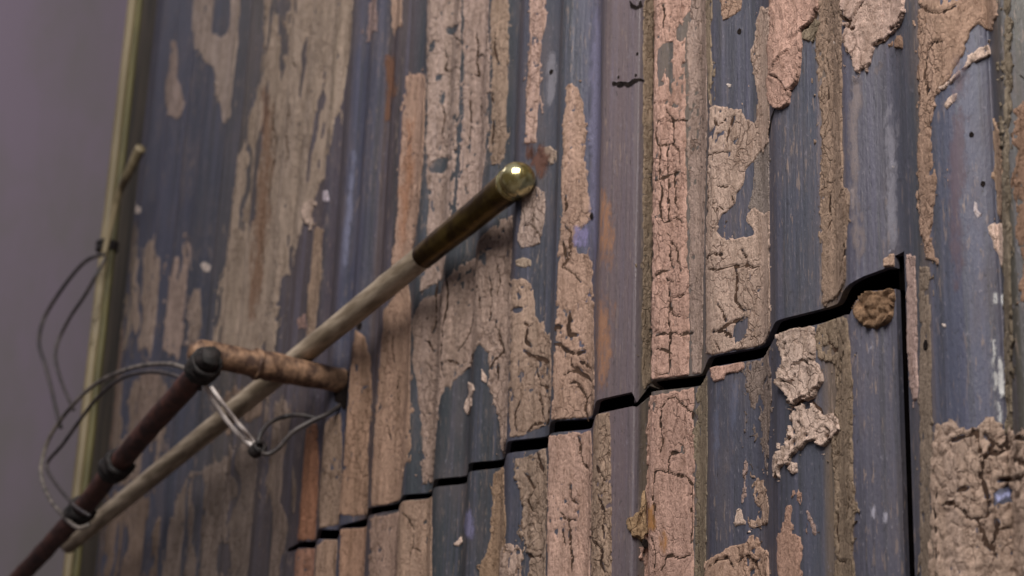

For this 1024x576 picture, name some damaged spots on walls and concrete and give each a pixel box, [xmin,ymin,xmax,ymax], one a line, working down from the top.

peeling [97,0,612,576]
crack [291,110,1024,576]
peeling [626,0,1024,576]